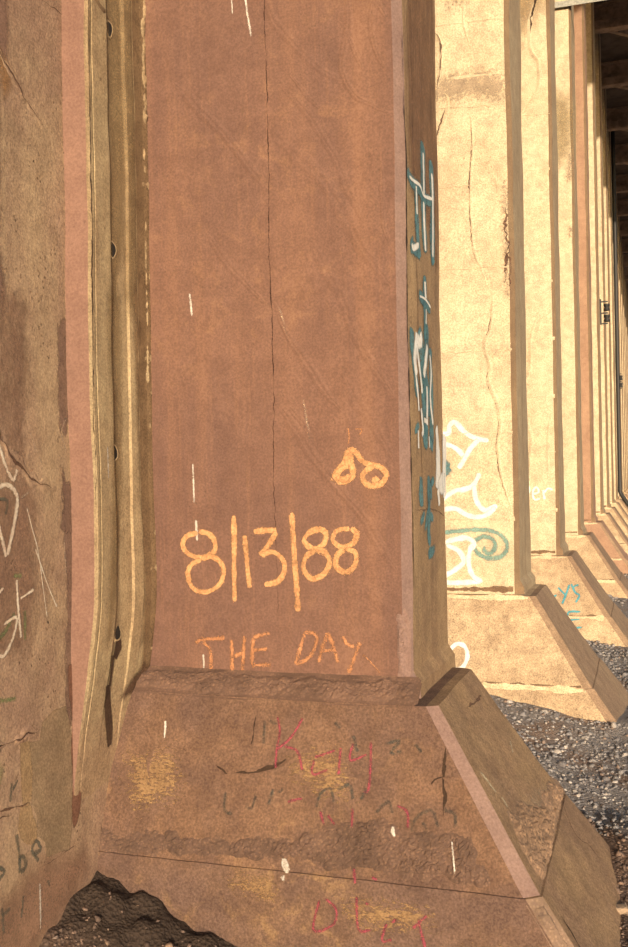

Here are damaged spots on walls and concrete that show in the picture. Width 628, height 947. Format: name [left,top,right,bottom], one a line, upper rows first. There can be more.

crack [529,0,537,32]
crack [0,50,47,136]
crack [0,431,57,494]
crack [0,725,39,750]
crack [217,759,286,774]